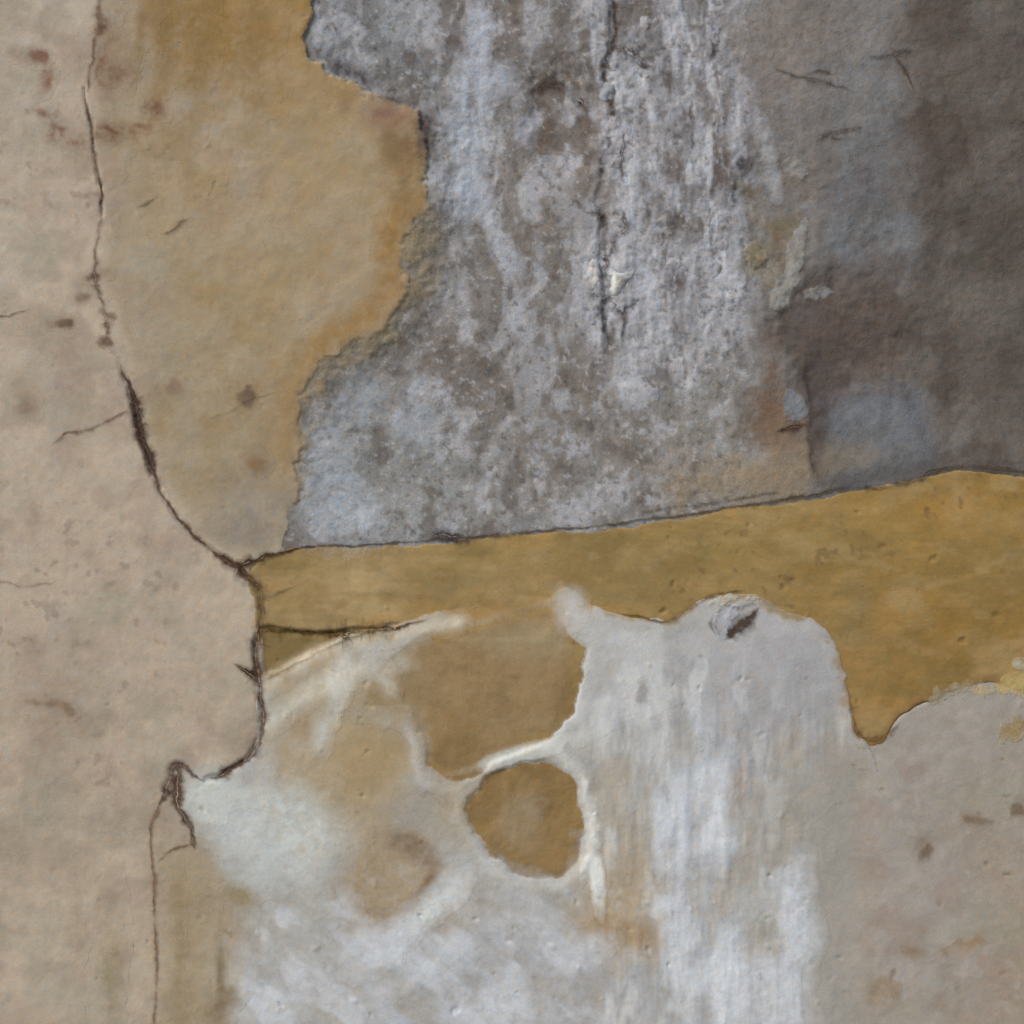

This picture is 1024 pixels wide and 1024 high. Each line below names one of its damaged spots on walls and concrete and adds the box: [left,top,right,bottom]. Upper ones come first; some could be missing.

crack [84,6,103,212]
crack [603,0,646,176]
crack [601,308,627,335]
spalling [304,0,1024,548]
water stain [63,608,531,1024]
water stain [445,724,627,1024]
crack [61,373,1024,1024]
efflorescence [549,579,593,640]
flaking render [236,575,1006,1024]
efflorescence [639,664,833,1024]
peeling [927,657,1024,706]
spalling [954,793,1024,831]